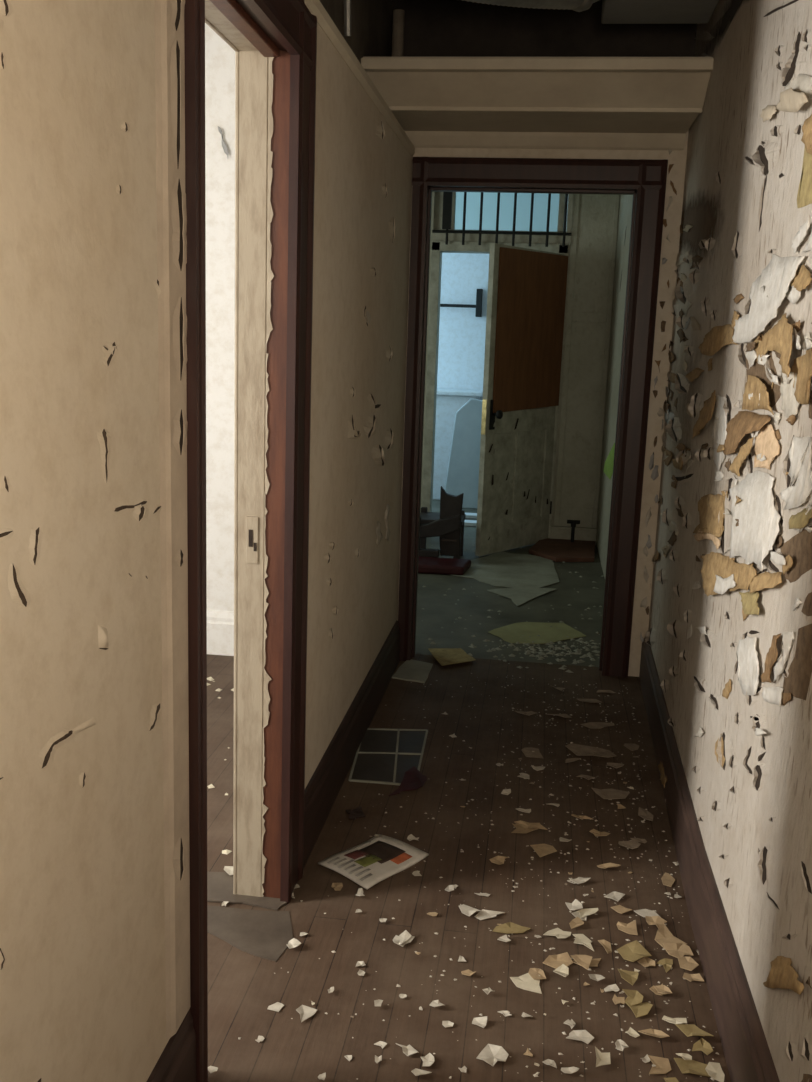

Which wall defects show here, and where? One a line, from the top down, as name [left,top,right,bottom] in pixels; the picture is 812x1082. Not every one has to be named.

peeling [640,29,812,793]
crack [0,476,12,493]
crack [0,526,43,607]
crack [38,717,96,769]
peeling [697,800,722,822]
peeling [799,861,812,911]
peeling [763,956,812,995]
peeling [785,1037,812,1061]